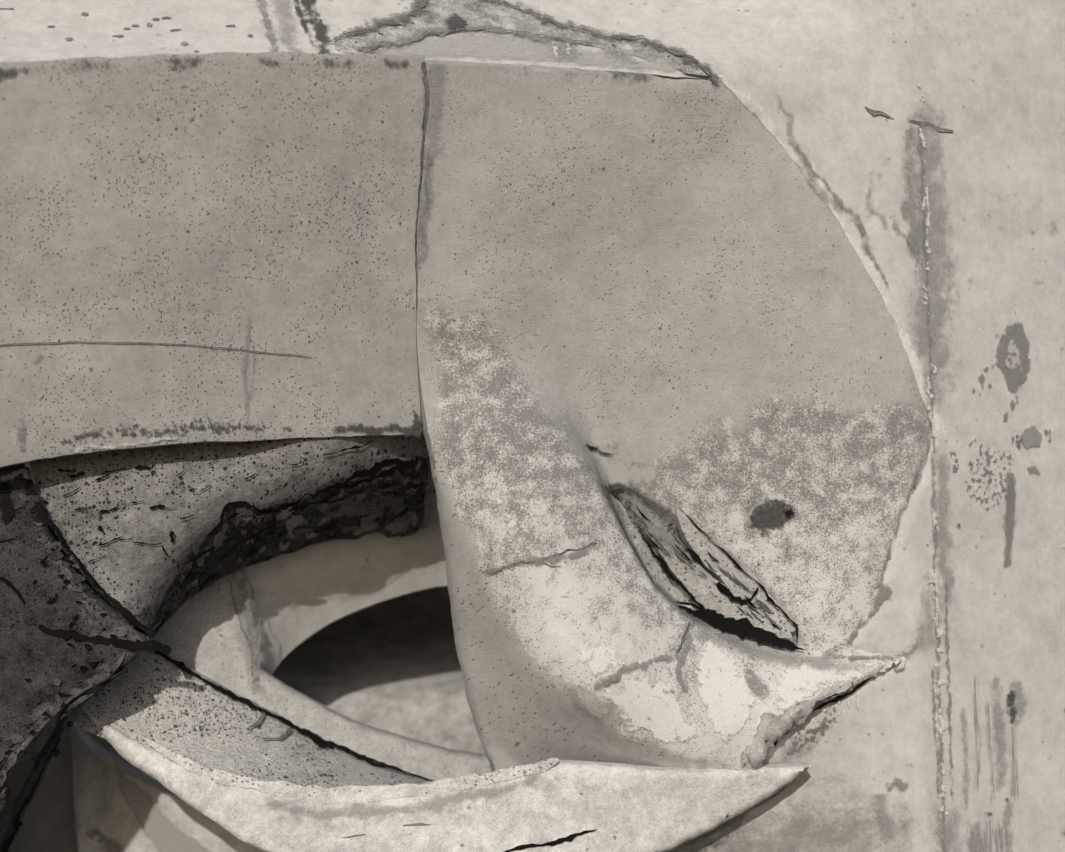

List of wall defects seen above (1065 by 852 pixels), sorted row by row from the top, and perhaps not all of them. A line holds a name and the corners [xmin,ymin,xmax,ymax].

damp [257,0,330,54]
spalling [328,0,719,80]
spalling [60,419,293,452]
spalling [335,410,422,437]
damp [779,102,1024,852]
spalling [152,456,429,634]
spalling [587,444,805,650]
peeling [823,414,932,671]
spalling [143,737,559,818]
crack [504,829,597,852]